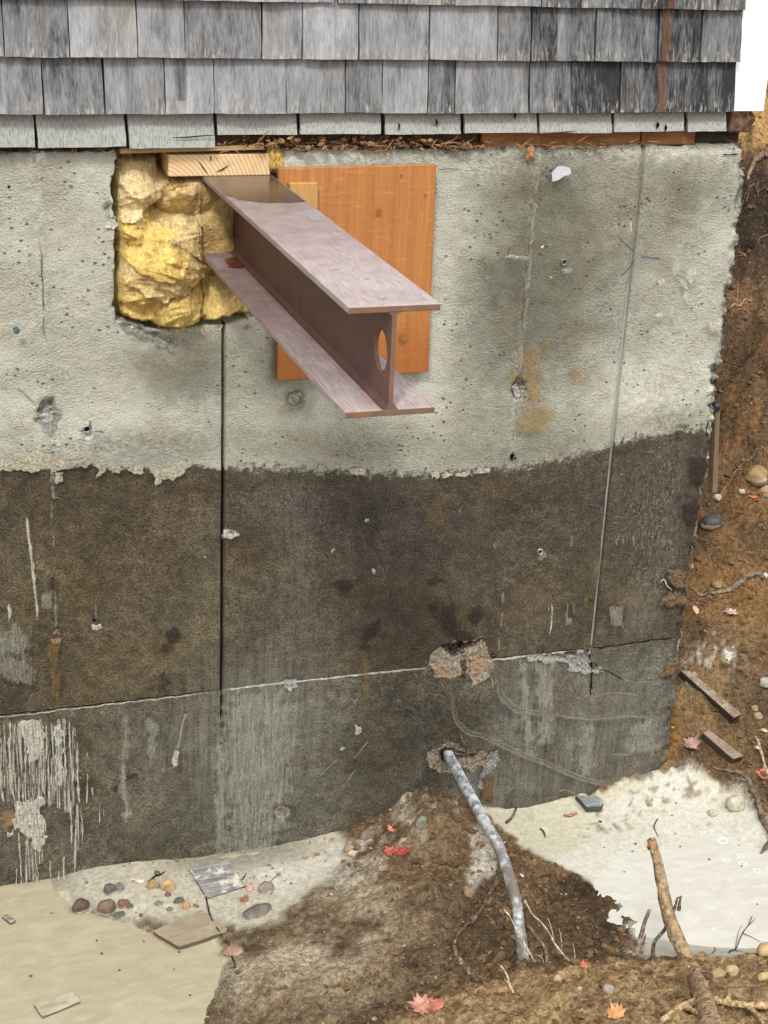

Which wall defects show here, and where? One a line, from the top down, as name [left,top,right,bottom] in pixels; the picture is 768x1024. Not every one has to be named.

spalling [33,397,62,433]
leakage [0,423,711,887]
spalling [428,602,495,687]
spalling [426,742,501,802]